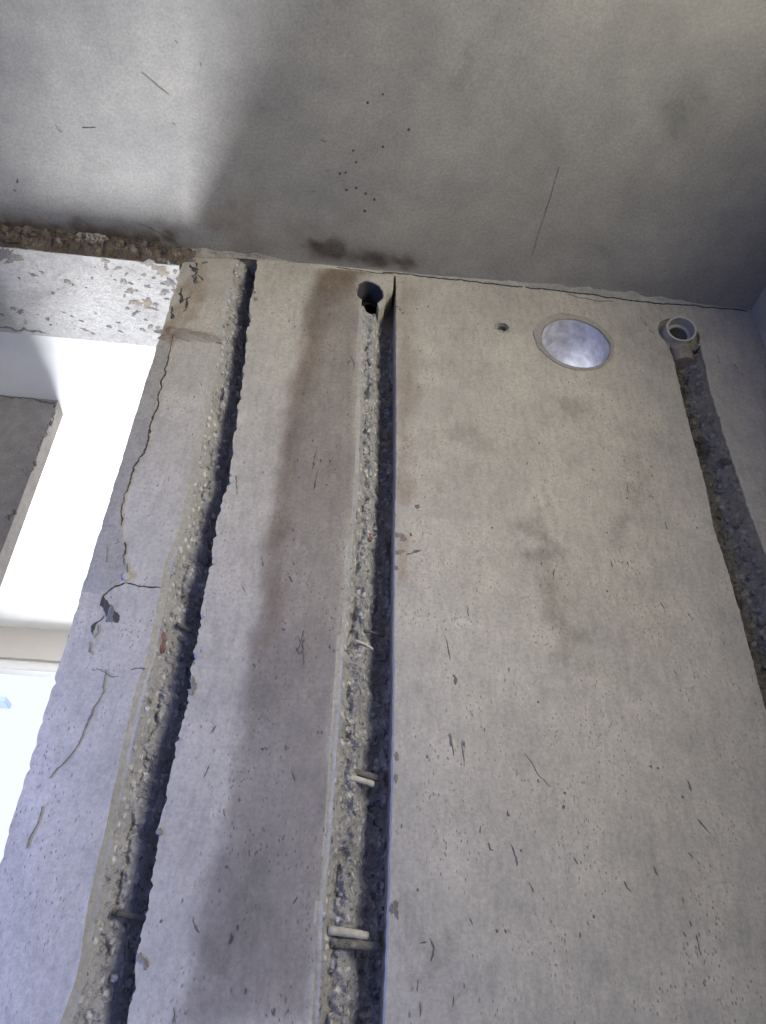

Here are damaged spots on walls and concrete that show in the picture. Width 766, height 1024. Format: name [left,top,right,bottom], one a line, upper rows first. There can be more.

crack [287,261,748,311]
crack [50,336,173,778]